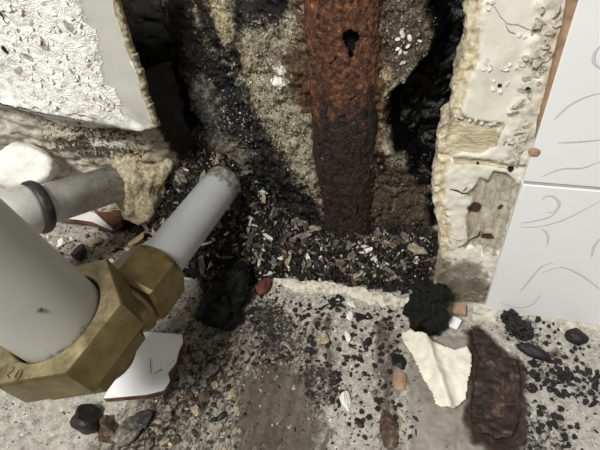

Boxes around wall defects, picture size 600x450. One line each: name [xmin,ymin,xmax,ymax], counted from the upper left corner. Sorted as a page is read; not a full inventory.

water stain [160,0,320,221]
corrosion [279,0,318,146]
hole [342,29,359,57]
corrosion [360,7,391,198]
peeling [395,28,422,65]
crack [491,4,542,35]
flaking render [481,5,563,117]
flaking render [446,117,534,255]